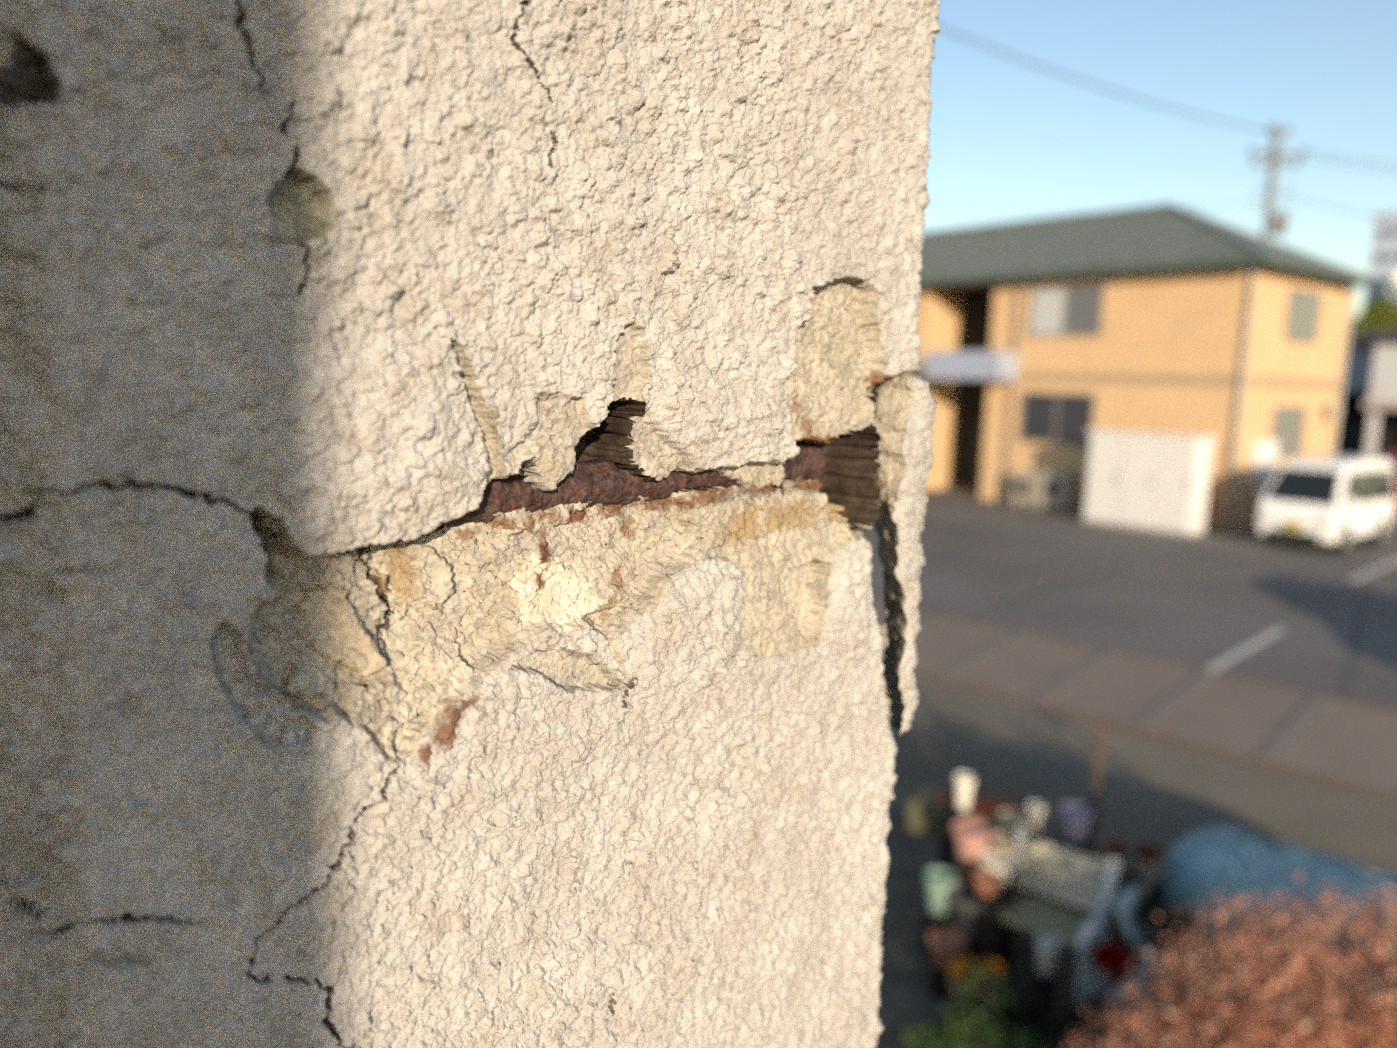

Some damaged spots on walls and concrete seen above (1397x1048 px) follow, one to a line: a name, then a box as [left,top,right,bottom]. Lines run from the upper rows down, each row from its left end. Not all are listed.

crack [510,0,558,168]
crack [0,180,46,190]
crack [0,479,248,523]
spalling [209,274,921,766]
corrosion [436,443,848,542]